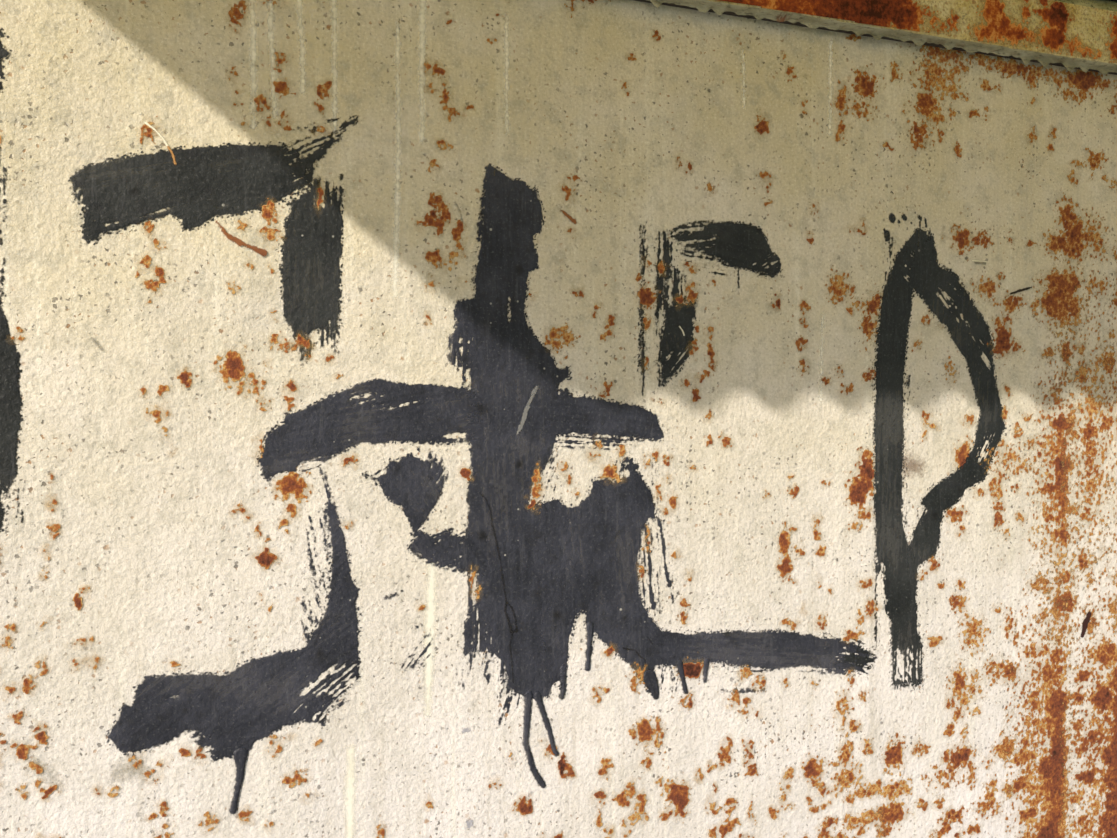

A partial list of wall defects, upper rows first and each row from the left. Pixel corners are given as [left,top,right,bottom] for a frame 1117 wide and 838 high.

corrosion [135,221,166,304]
corrosion [416,192,466,287]
corrosion [140,367,192,436]
corrosion [214,346,297,411]
corrosion [231,471,313,569]
corrosion [768,148,1117,838]
corrosion [728,665,766,719]
corrosion [0,711,59,800]
corrosion [282,769,310,797]
corrosion [512,796,533,816]
corrosion [541,740,575,779]
corrosion [594,716,758,838]